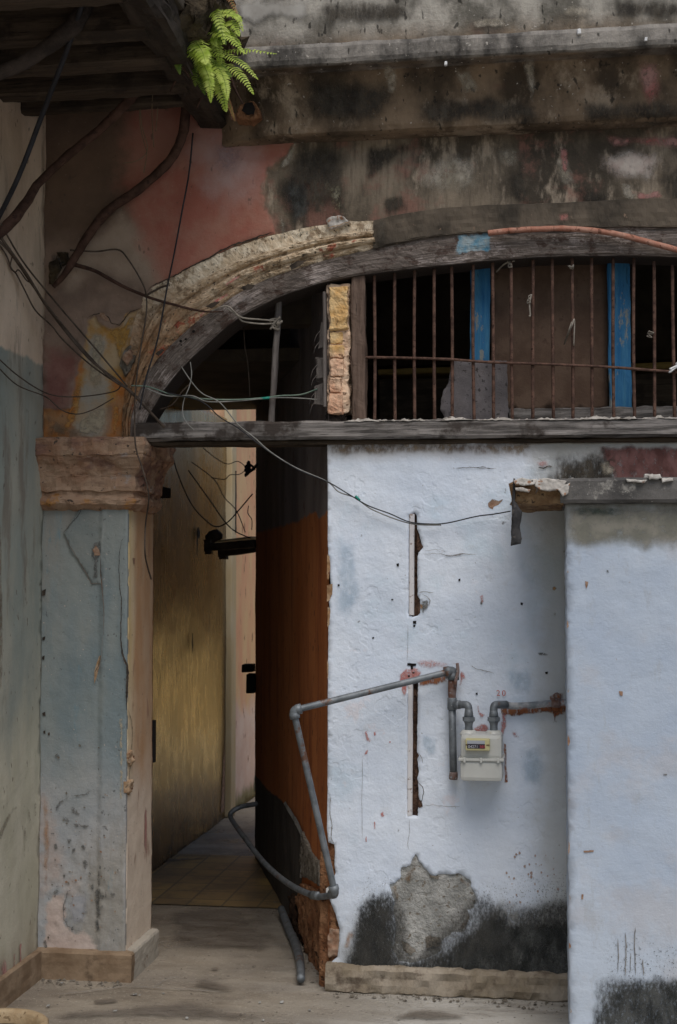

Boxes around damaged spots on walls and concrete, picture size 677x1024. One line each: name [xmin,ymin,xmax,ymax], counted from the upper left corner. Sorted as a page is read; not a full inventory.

leakage [424,98,534,122]
leakage [585,66,677,125]
leakage [368,147,404,175]
leakage [608,138,677,177]
peeling [146,232,271,293]
peeling [513,462,570,496]
peeling [626,474,673,483]
rust [501,694,566,719]
spalling [283,799,340,987]
spalling [390,854,476,963]
leakage [346,875,568,974]
mould [595,929,677,1024]